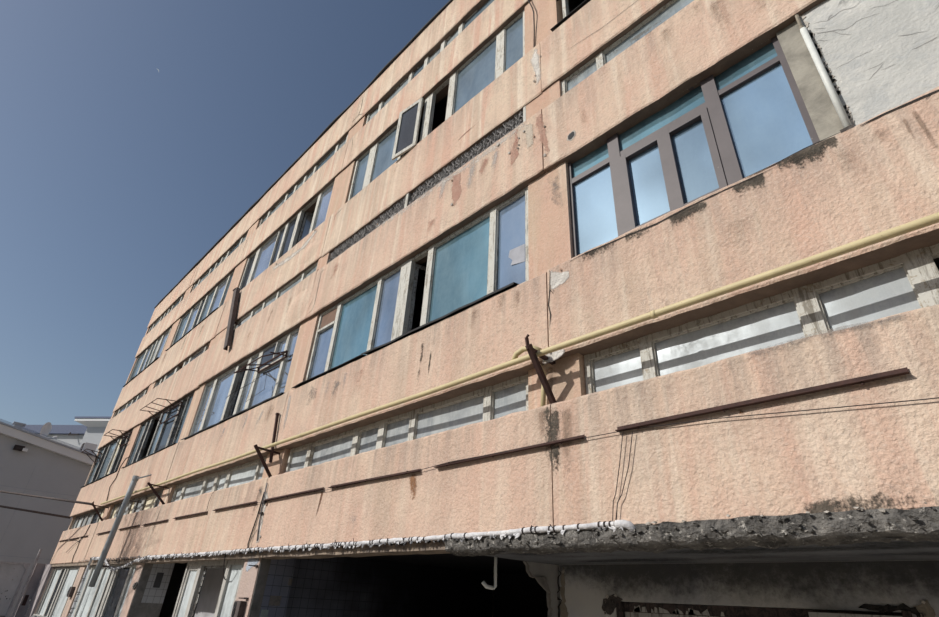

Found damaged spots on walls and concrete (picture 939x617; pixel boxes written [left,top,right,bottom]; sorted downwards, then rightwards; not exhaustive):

spalling [444,502,939,617]